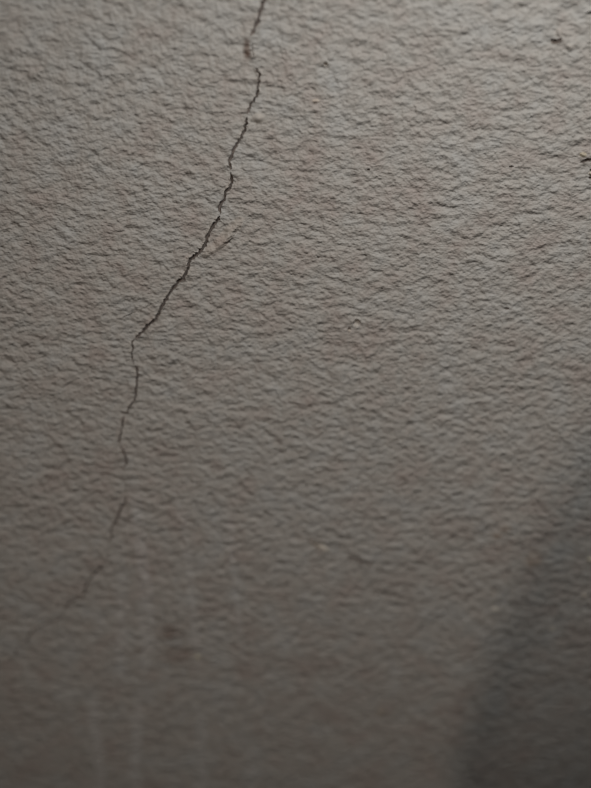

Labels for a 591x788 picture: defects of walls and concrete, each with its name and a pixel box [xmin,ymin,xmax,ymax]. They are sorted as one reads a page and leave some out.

crack [1,0,266,664]